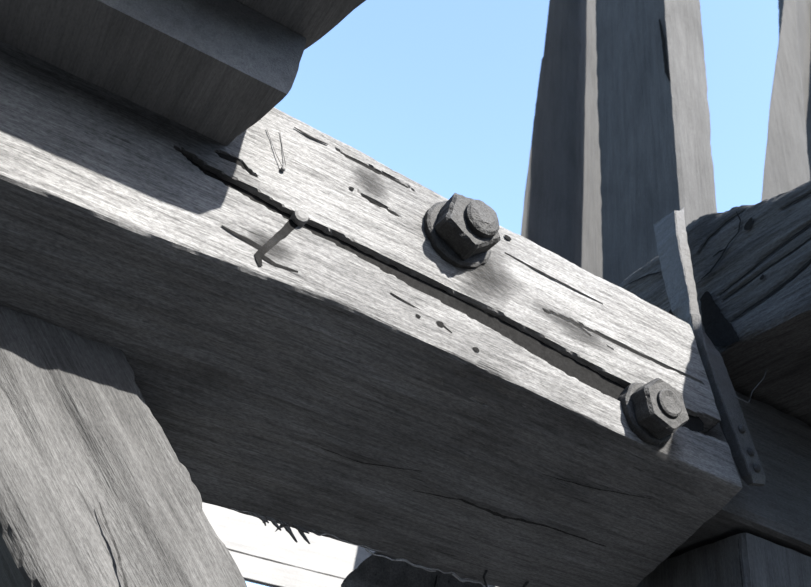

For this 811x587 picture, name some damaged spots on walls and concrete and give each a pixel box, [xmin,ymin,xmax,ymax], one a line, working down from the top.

crack [659,19,671,82]
crack [294,127,413,191]
crack [186,152,625,400]
crack [700,210,744,280]
crack [544,310,686,376]
crack [682,414,704,432]
crack [322,448,606,547]